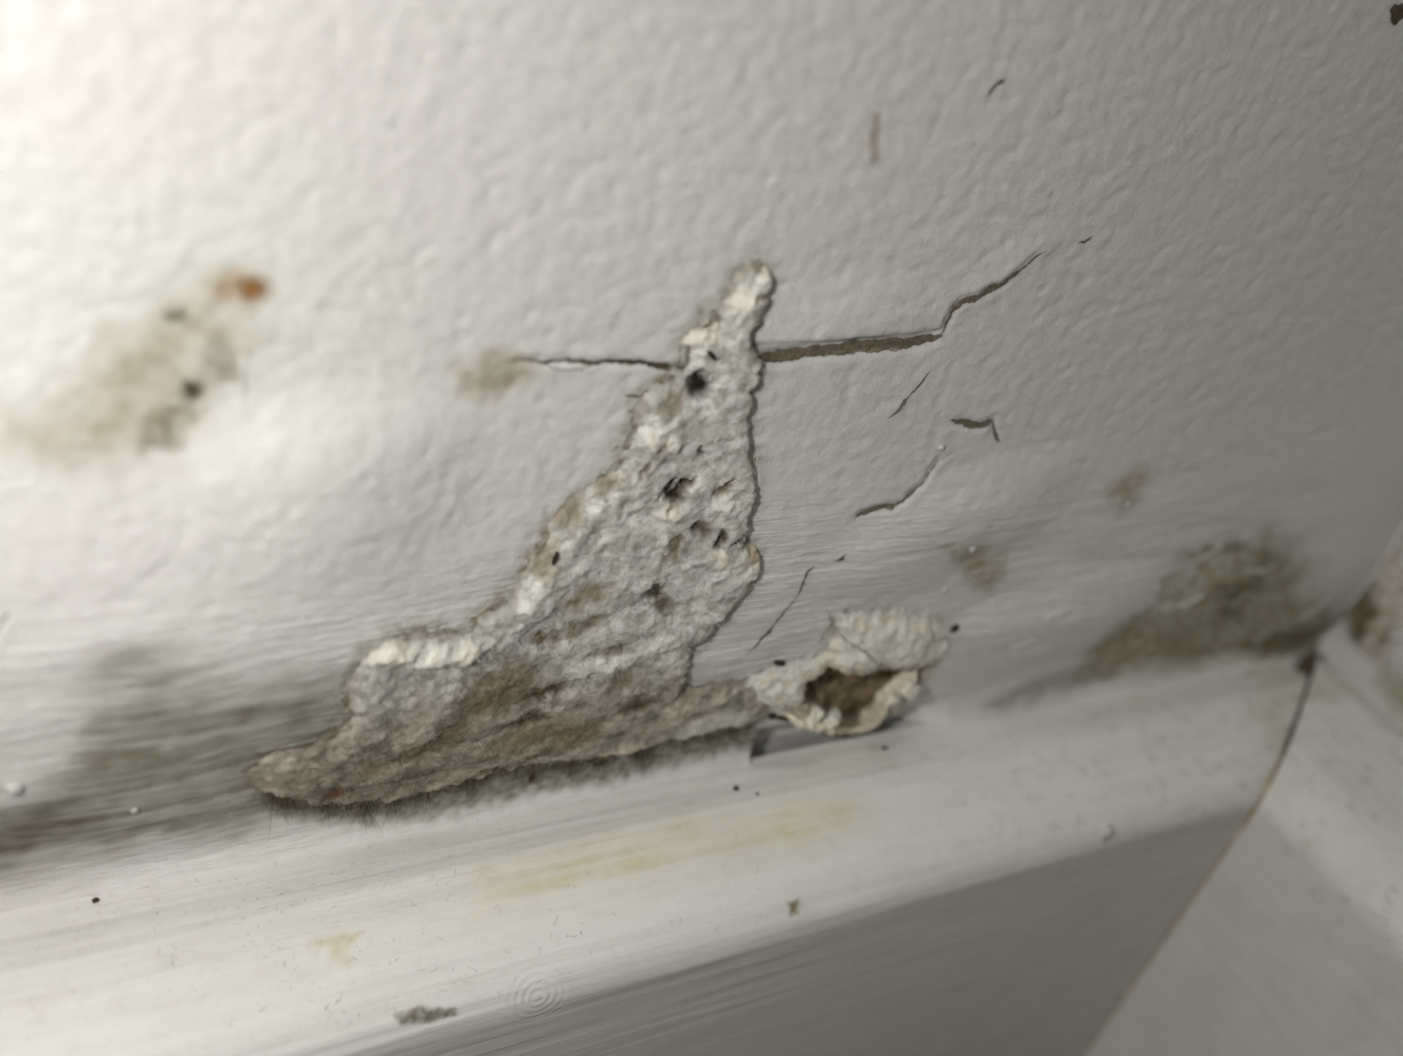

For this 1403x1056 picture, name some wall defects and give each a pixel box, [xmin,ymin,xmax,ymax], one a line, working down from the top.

crack [759,252,1043,418]
crack [855,419,1000,517]
flaking render [241,219,1074,836]
crack [746,555,845,655]
leakage [1236,583,1385,655]